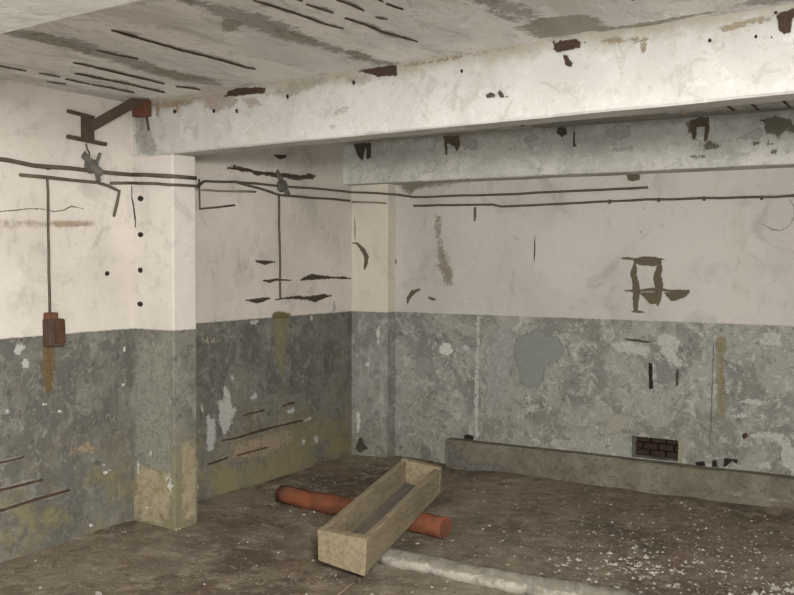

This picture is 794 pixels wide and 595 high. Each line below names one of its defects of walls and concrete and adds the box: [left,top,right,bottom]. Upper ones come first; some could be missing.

spalling [253,0,418,42]
spalling [771,8,794,38]
spalling [39,62,165,93]
water stain [2,30,219,85]
spalling [111,29,256,70]
spalling [359,65,397,79]
spalling [549,39,586,67]
spalling [622,249,690,313]
corrosion [42,347,56,396]
peeling [201,374,311,452]
corrosion [228,427,294,463]
flaking render [133,442,197,525]